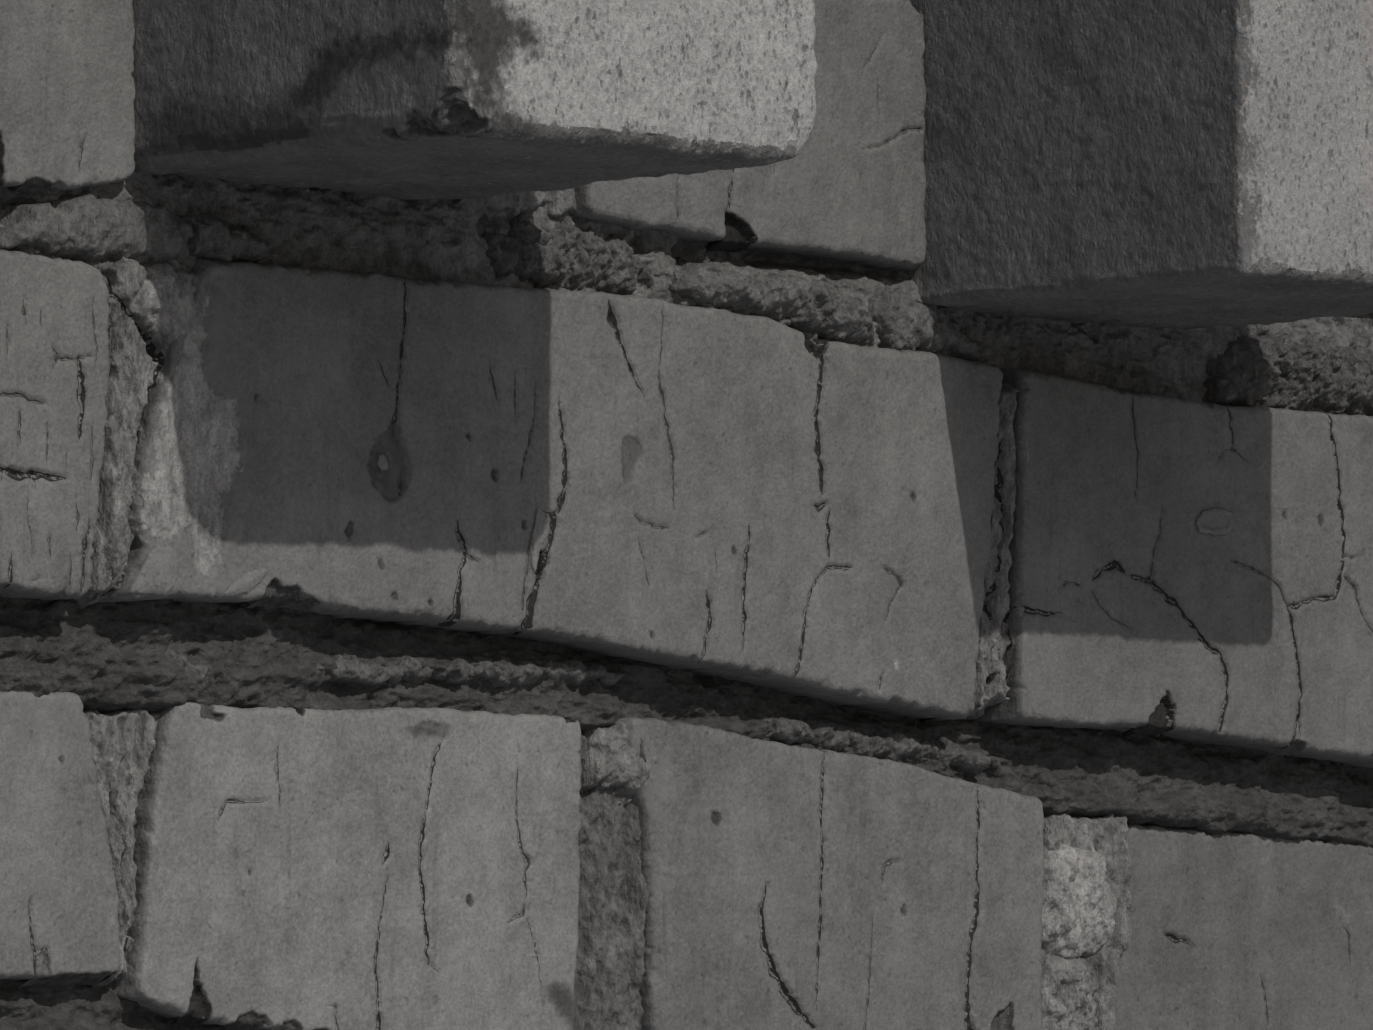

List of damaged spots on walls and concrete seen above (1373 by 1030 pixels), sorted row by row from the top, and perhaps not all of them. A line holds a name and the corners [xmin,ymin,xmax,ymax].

crack [862,107,921,149]
crack [0,272,164,601]
crack [377,274,406,435]
crack [489,365,567,635]
crack [794,342,903,678]
crack [983,397,1229,735]
crack [1231,410,1373,749]
crack [374,736,444,1030]
crack [508,772,542,985]
crack [758,752,825,1029]
crack [964,786,980,1030]
peeling [991,1003,1014,1030]